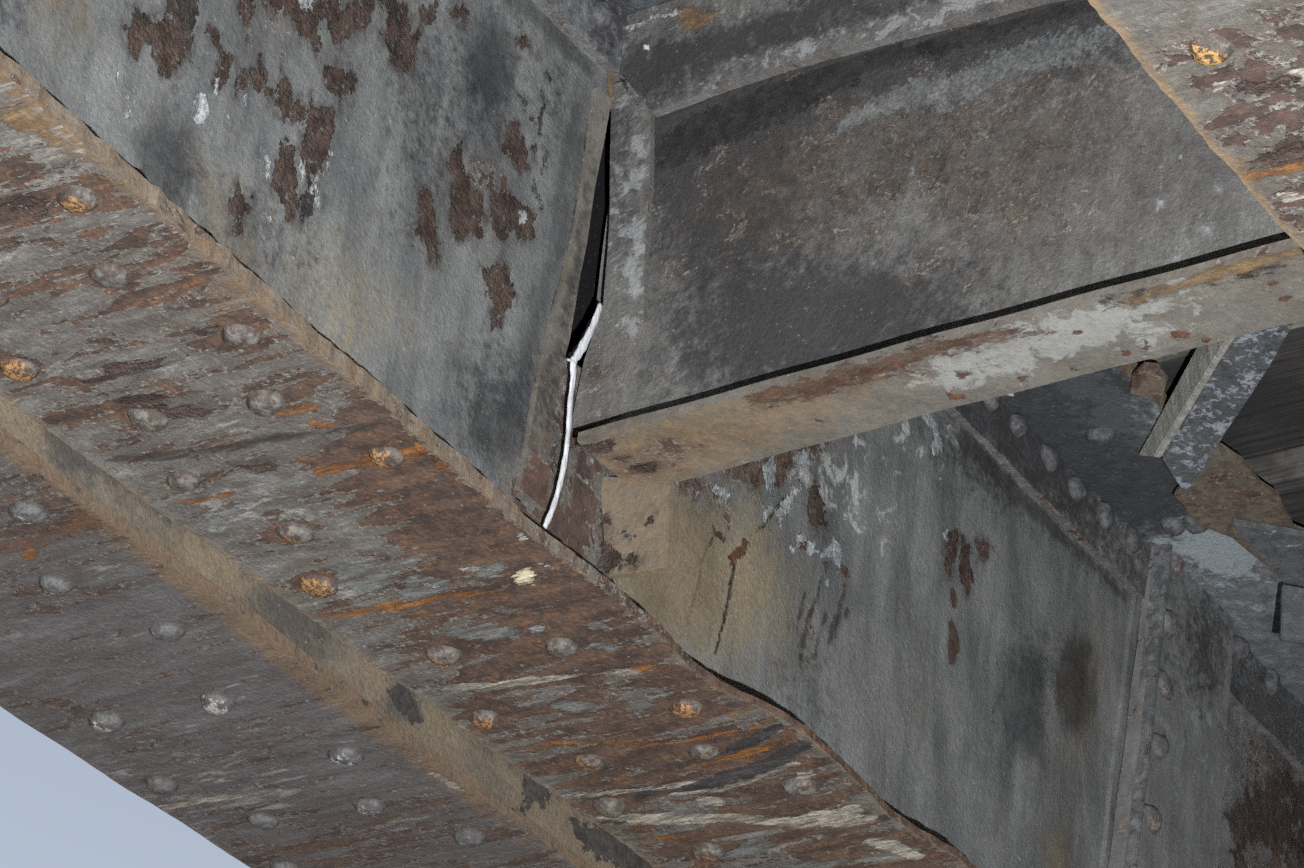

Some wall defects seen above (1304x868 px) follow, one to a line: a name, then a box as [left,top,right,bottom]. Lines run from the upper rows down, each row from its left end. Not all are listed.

corrosion [1244,161,1304,181]
corrosion [1124,248,1304,305]
corrosion [1171,331,1211,342]
corrosion [728,538,750,567]
corrosion [948,570,971,665]
corrosion [1222,771,1304,868]